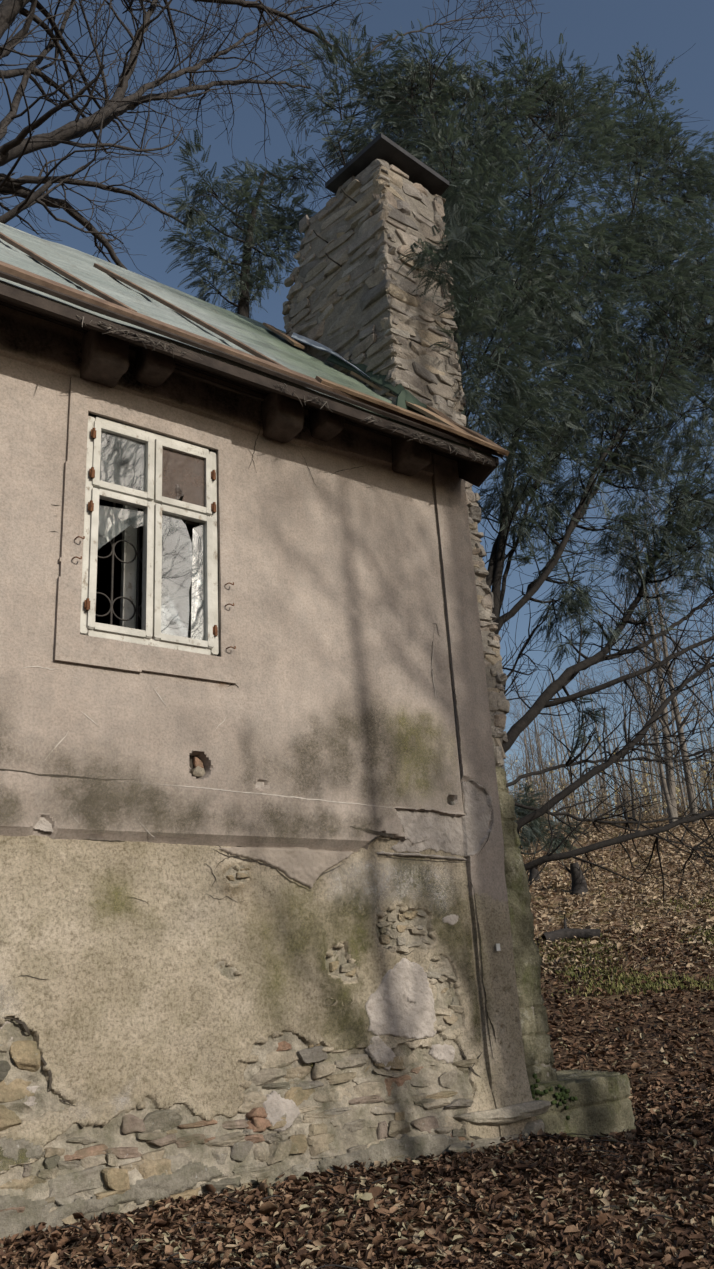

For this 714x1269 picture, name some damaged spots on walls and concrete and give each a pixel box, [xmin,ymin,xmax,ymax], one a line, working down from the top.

flaking render [0,903,479,1238]
crack [0,769,496,1078]
water stain [296,713,401,800]
flaking render [377,779,493,860]
crack [431,488,486,805]